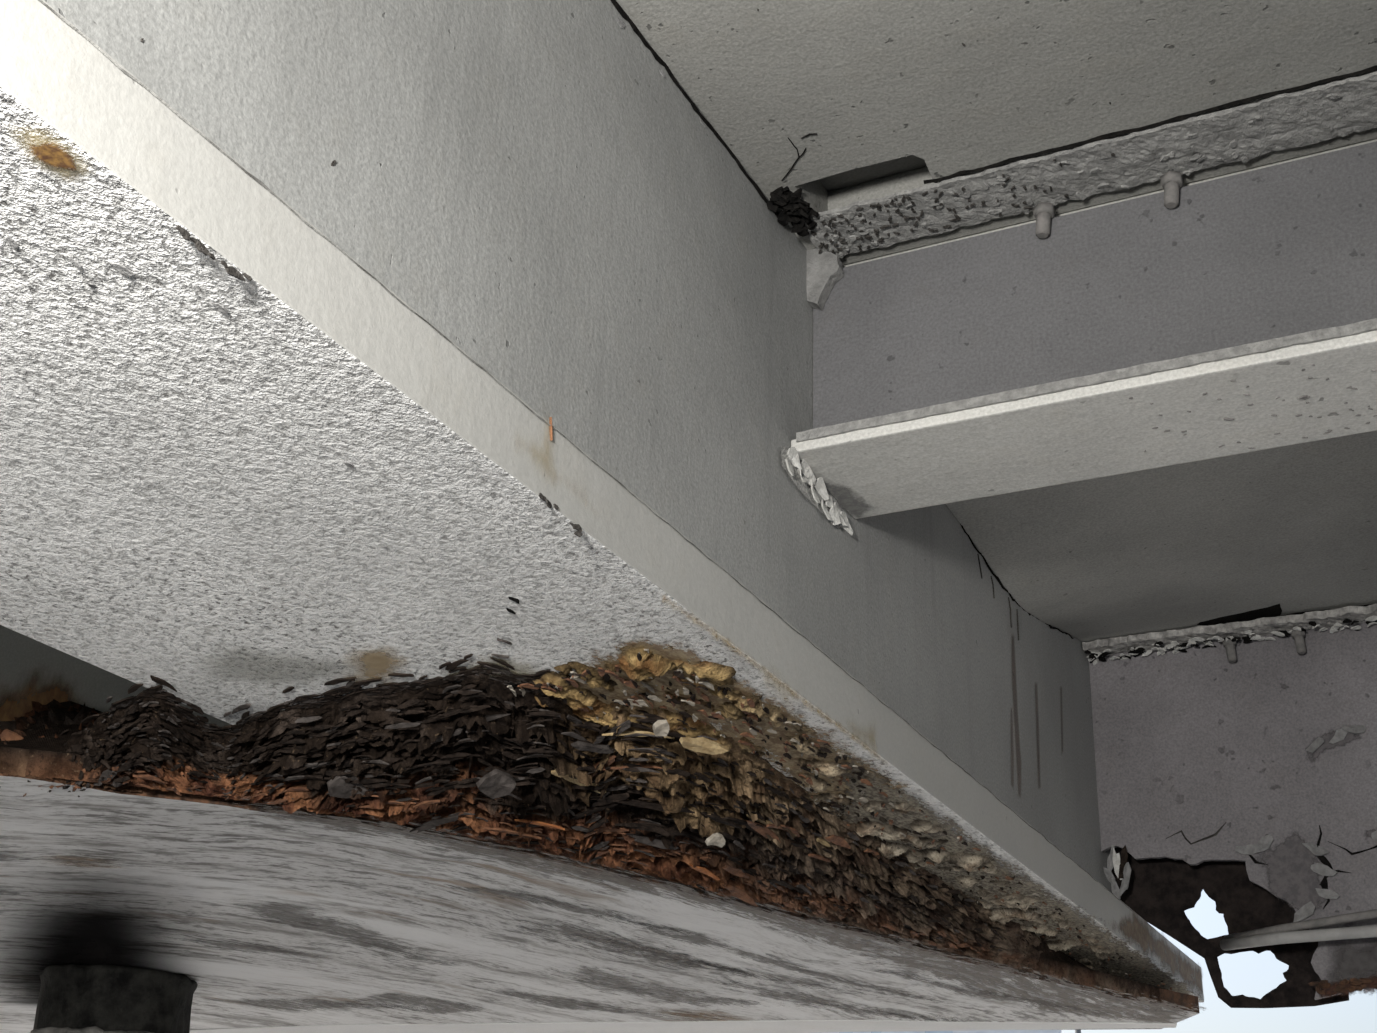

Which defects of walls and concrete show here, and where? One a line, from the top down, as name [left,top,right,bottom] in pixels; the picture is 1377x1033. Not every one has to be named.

corrosion [31,136,76,170]
crack [610,0,817,218]
spalling [1160,133,1249,176]
spalling [766,153,1130,258]
peeling [780,446,853,535]
crack [960,524,1073,640]
spalling [1084,603,1377,665]
corrosion [23,632,1203,1003]
peeling [1103,845,1131,899]
peeling [1235,834,1339,922]